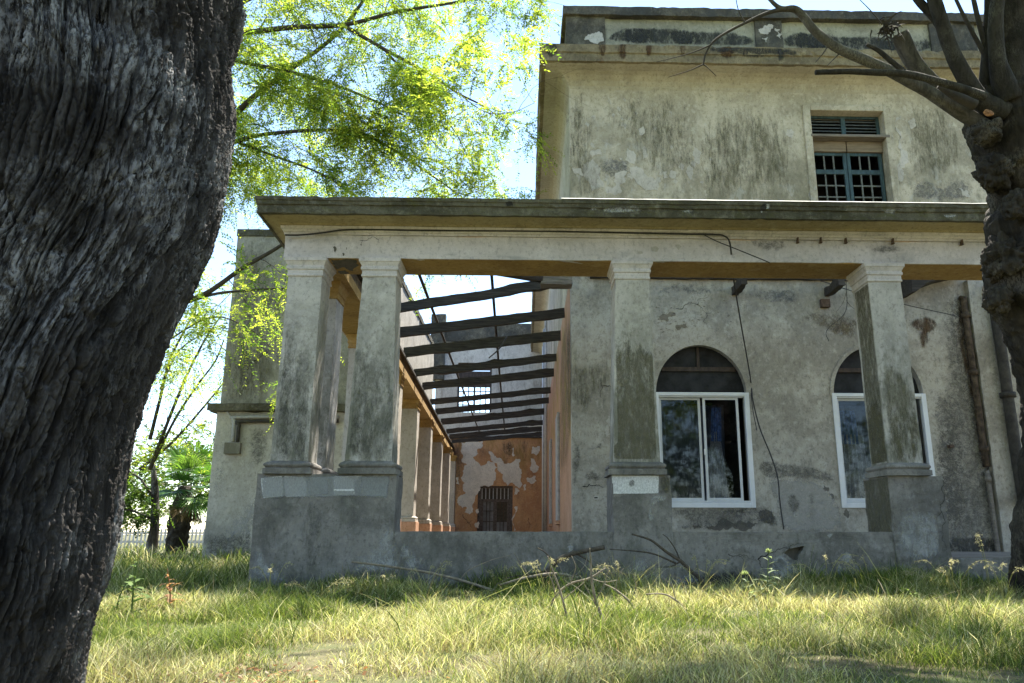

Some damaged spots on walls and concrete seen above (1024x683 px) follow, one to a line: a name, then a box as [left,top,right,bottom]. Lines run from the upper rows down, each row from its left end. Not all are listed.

leakage [610,28,896,61]
peeling [758,24,782,41]
leakage [708,120,789,191]
corrosion [912,317,936,348]
corrosion [959,306,975,406]
peeling [456,441,540,531]